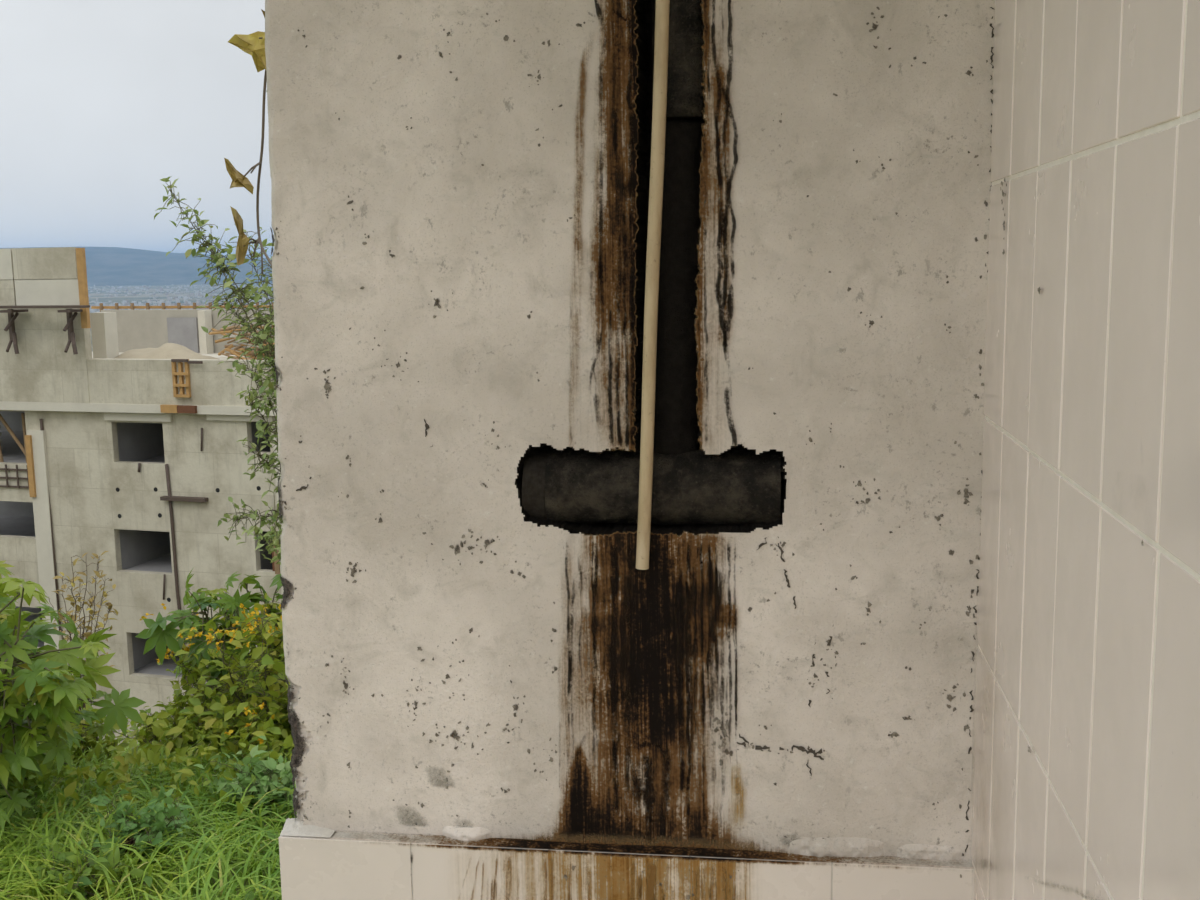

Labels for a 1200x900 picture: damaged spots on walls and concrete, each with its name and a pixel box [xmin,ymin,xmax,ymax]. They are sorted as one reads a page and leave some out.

spalling [280,575,297,610]
spalling [284,675,311,820]
corrosion [731,776,744,818]
corrosion [471,851,747,900]